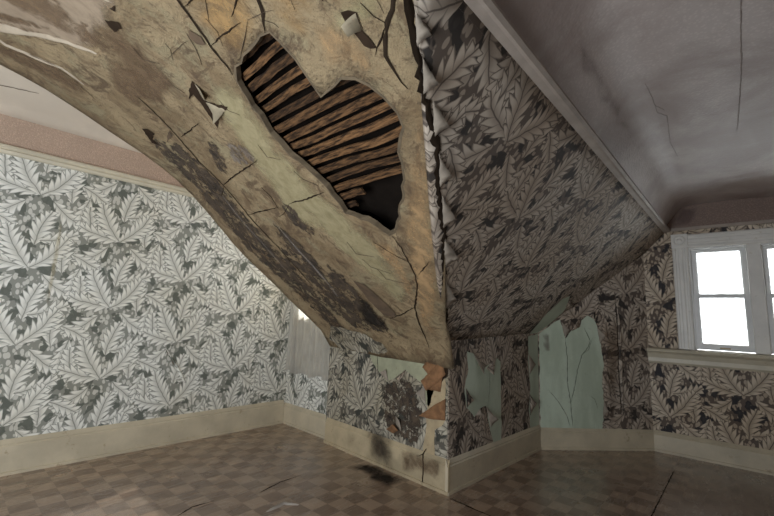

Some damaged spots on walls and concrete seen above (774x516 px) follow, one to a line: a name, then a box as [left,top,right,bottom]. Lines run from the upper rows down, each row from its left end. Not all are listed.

crack [133,0,279,75]
spalling [340,10,376,49]
crack [361,0,408,89]
crack [736,0,744,129]
spalling [234,31,405,236]
crack [139,98,324,283]
crack [347,236,429,347]
damp [359,465,398,485]
damp [372,434,390,459]
damp [382,379,423,444]
spalling [416,362,448,402]